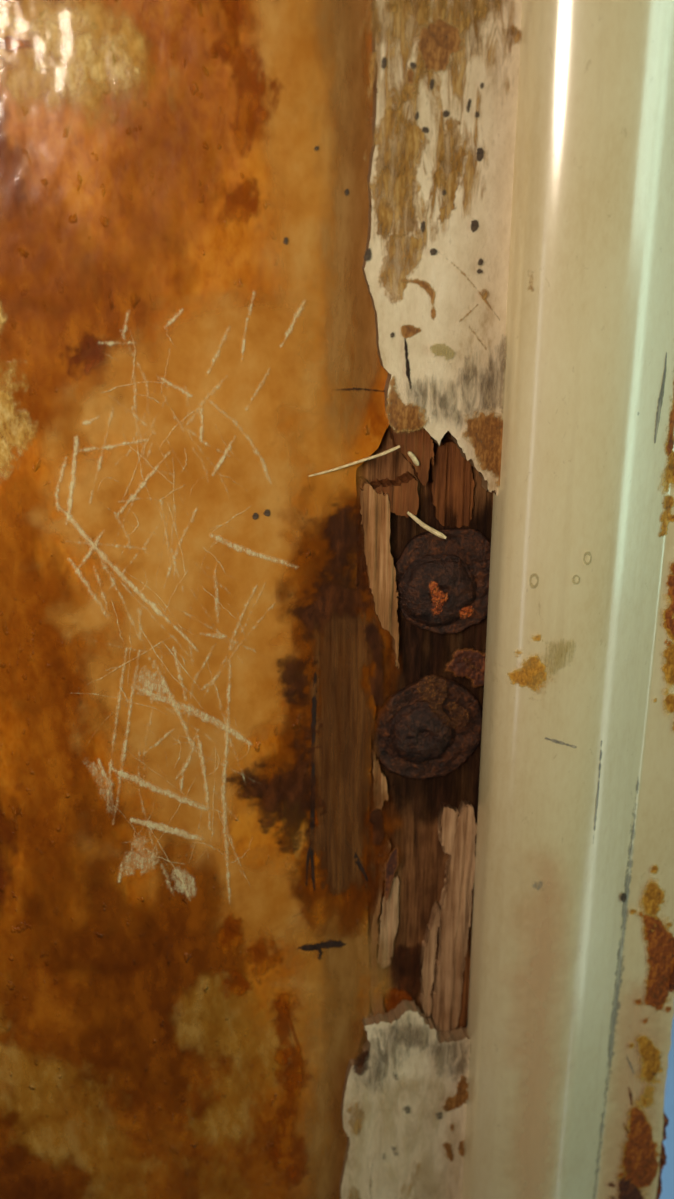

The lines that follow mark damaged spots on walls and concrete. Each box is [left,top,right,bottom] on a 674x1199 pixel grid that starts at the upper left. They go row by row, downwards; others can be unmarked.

corrosion [659,401,674,537]
corrosion [417,650,486,729]
corrosion [508,651,547,691]
corrosion [654,563,674,730]
corrosion [608,865,674,1199]